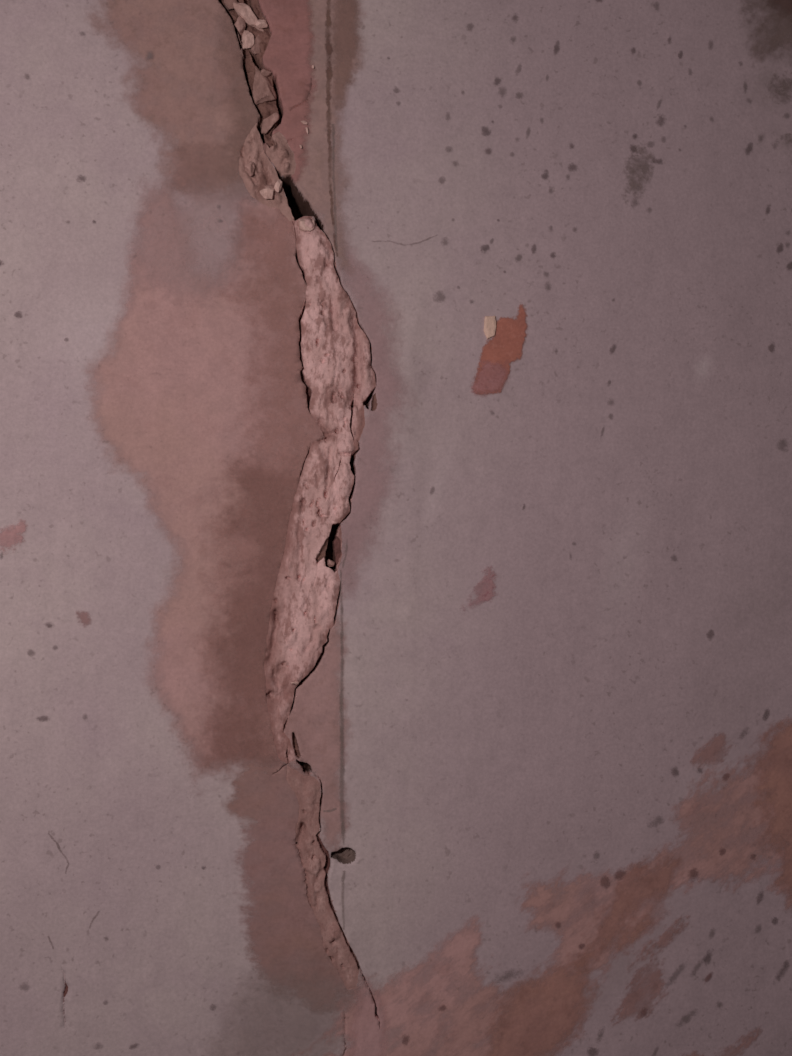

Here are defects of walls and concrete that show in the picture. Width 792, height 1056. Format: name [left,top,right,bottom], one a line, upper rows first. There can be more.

damp [94,0,360,1011]
crack [218,0,324,232]
crack [299,307,312,408]
crack [284,392,378,1016]
damp [293,0,399,584]